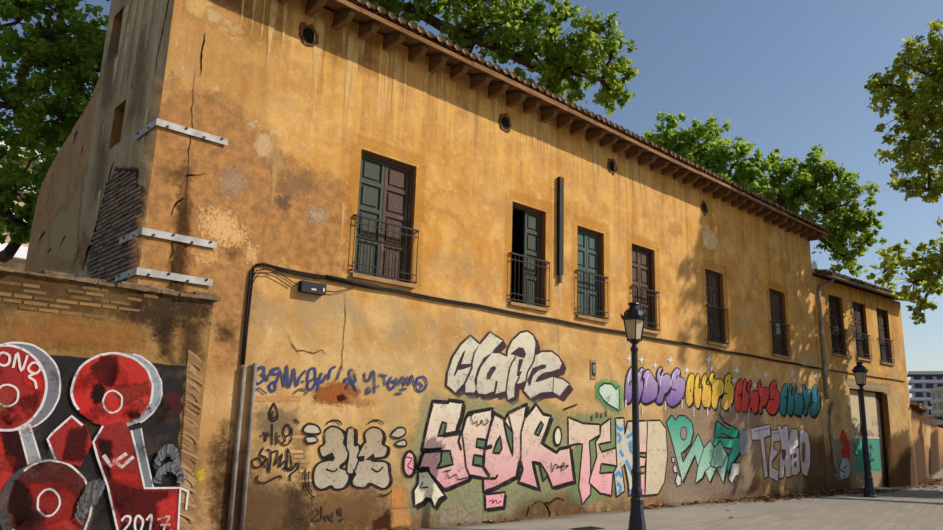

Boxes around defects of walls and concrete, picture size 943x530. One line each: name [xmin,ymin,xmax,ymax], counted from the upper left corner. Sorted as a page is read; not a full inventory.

peeling [184,0,243,36]
crack [167,33,206,291]
peeling [0,71,350,365]
crack [289,299,346,369]
spalling [313,382,371,407]